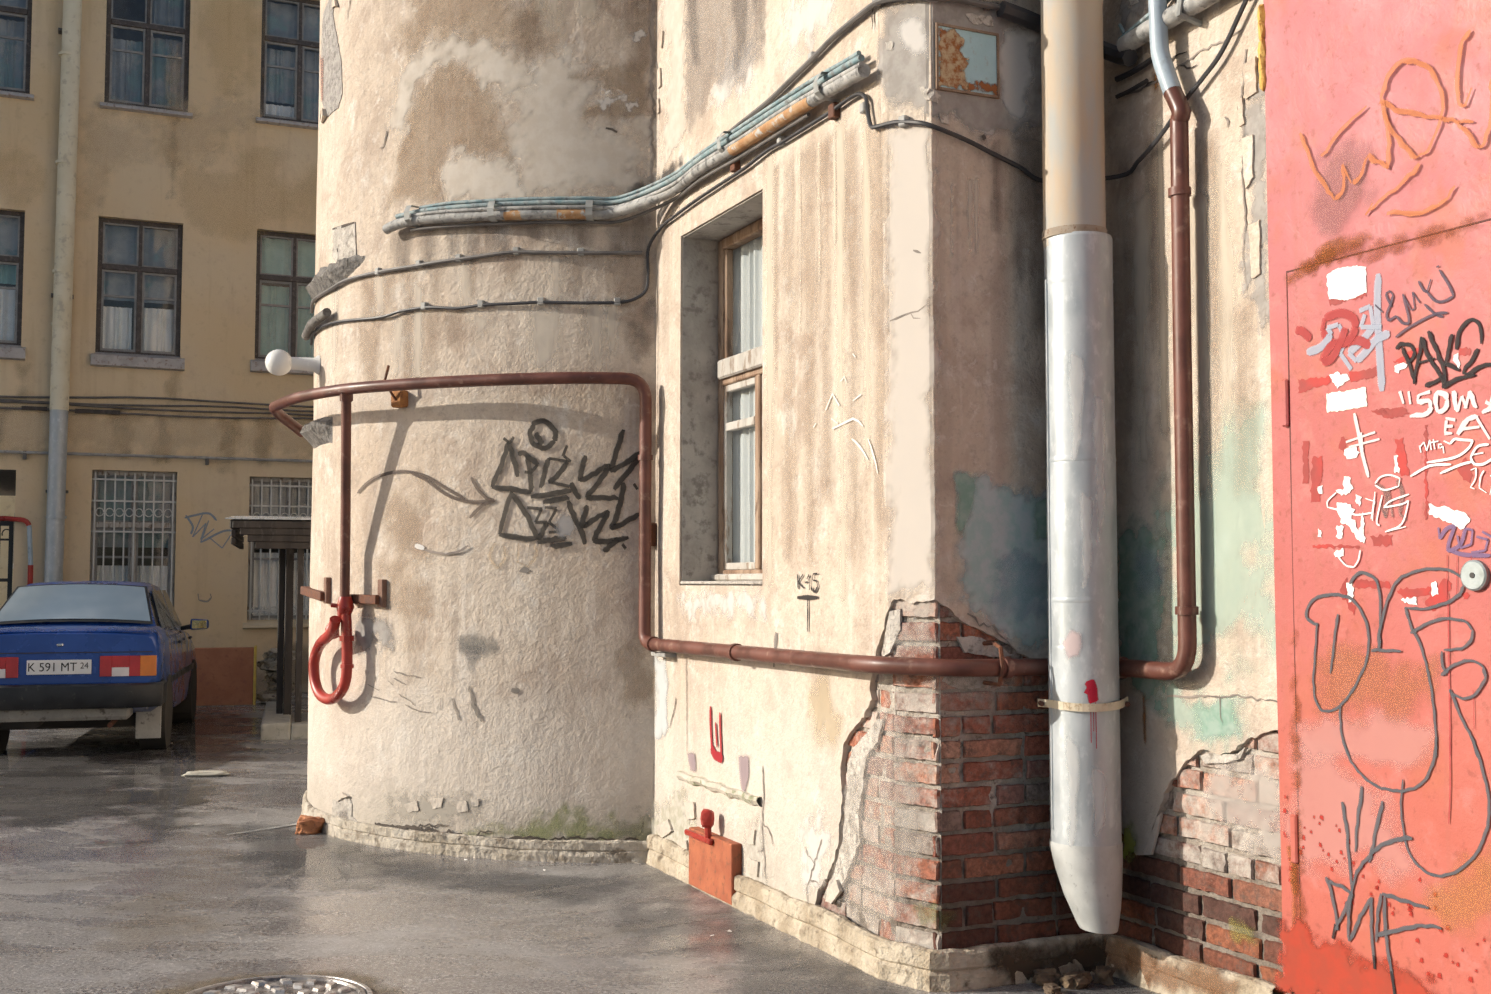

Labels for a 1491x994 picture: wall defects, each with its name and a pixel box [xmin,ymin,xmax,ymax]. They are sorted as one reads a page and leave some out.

flaking render [390,0,687,206]
corrosion [939,28,997,96]
flaking render [1237,49,1270,326]
spalling [800,599,1091,950]
spalling [1113,731,1485,994]